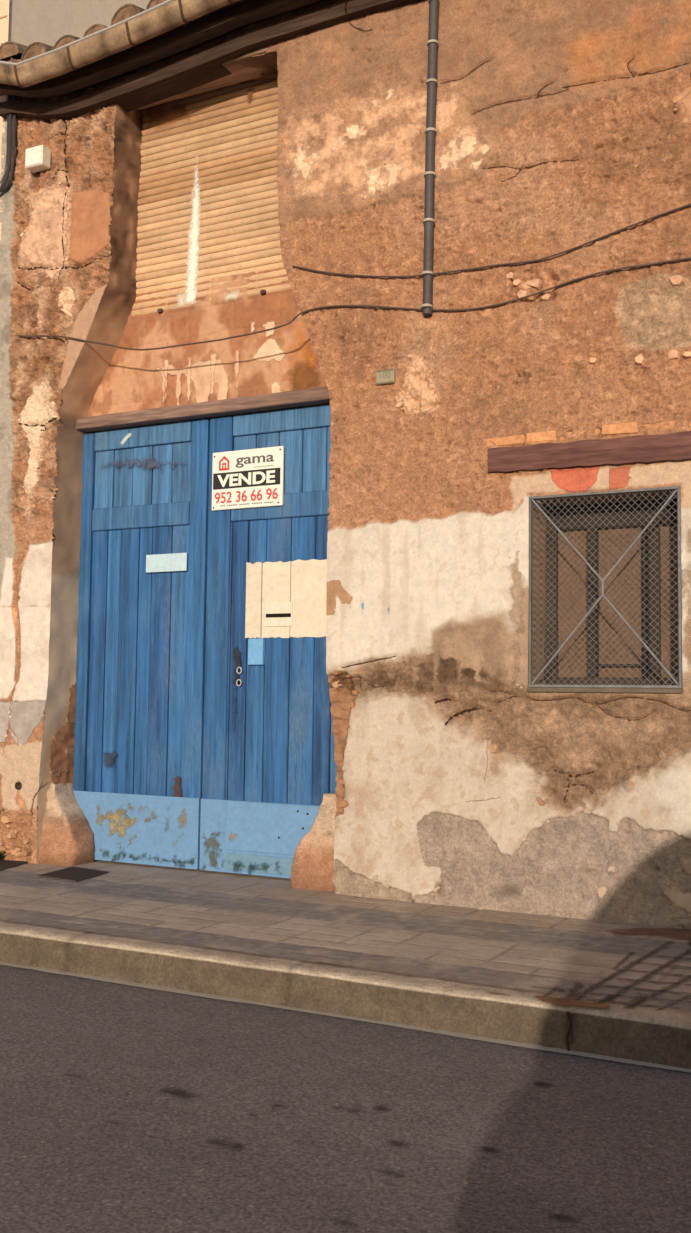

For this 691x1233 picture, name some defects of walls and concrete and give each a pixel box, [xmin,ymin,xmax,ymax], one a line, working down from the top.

crack [473,58,691,114]
peeling [250,321,285,361]
crack [435,690,691,726]
flaking render [326,556,691,930]
crack [555,769,595,801]